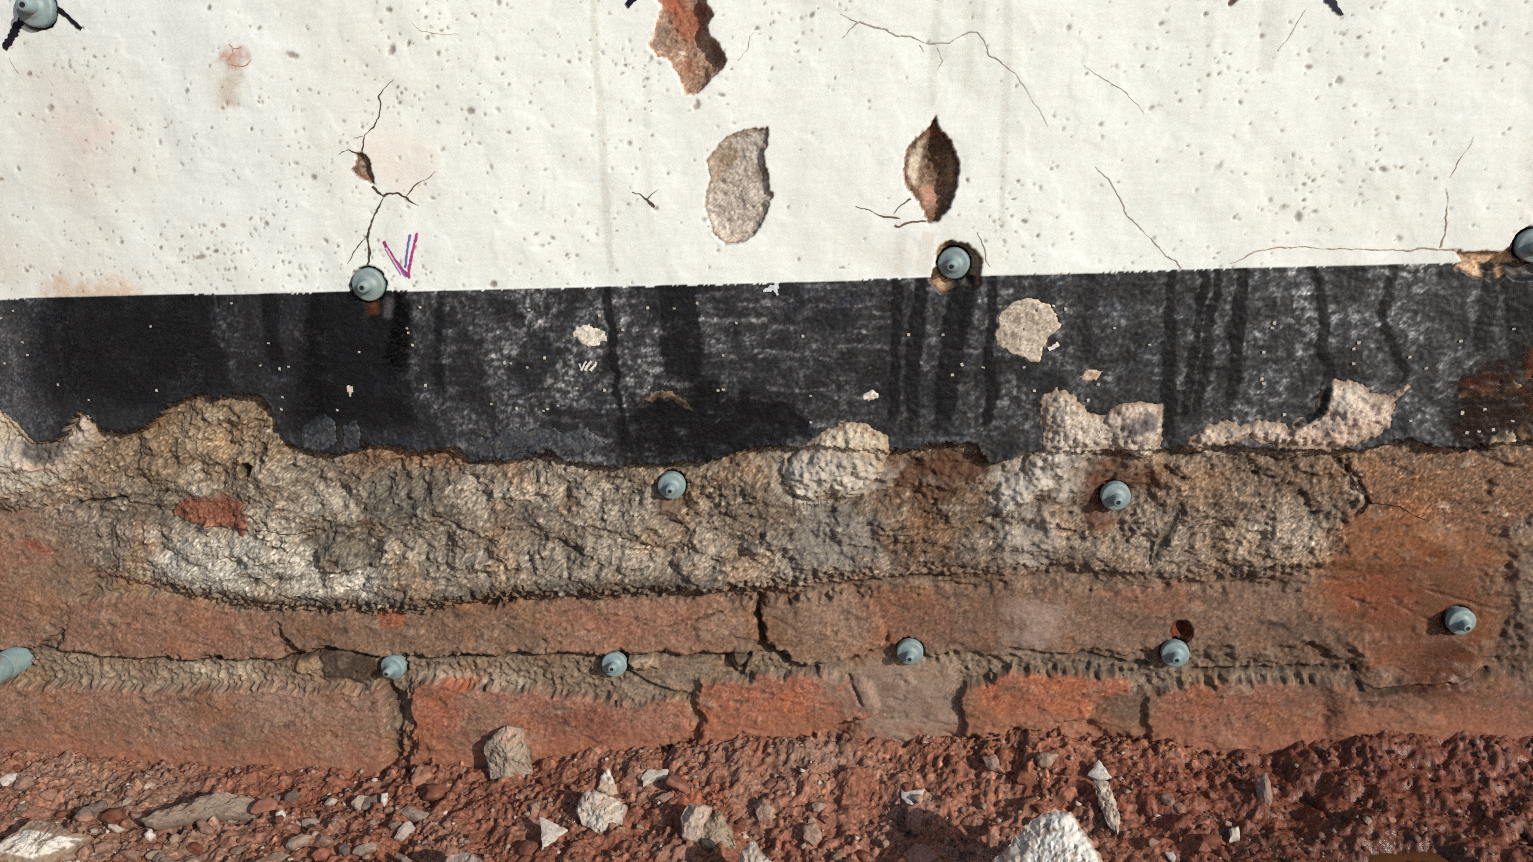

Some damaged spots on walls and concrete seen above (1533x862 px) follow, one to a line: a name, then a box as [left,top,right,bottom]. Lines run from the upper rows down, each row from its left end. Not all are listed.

flaking render [650,0,727,94]
crack [842,14,1048,125]
crack [340,80,432,268]
flaking render [706,128,773,244]
flaking render [904,120,959,222]
crack [1233,137,1474,263]
water stain [300,291,412,426]
water stain [602,285,807,462]
water stain [889,275,1000,428]
peeling [994,298,1061,362]
water stain [1161,268,1249,425]
rust [1453,261,1533,448]